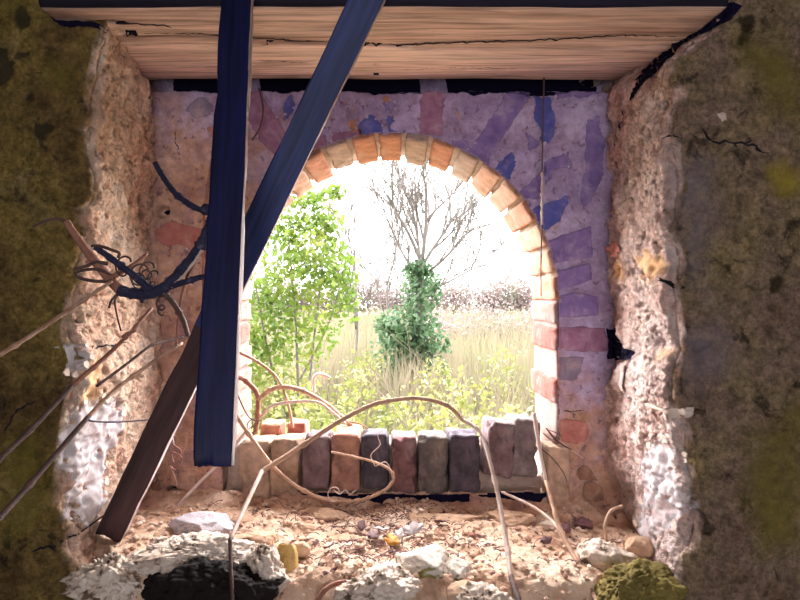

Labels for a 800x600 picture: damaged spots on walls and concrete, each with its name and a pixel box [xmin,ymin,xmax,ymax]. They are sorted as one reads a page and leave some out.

crack [116,21,218,36]
crack [253,37,323,63]
crack [364,34,676,47]
crack [702,129,767,153]
leakage [63,342,95,378]
flaking render [610,362,627,393]
spalling [645,403,694,419]